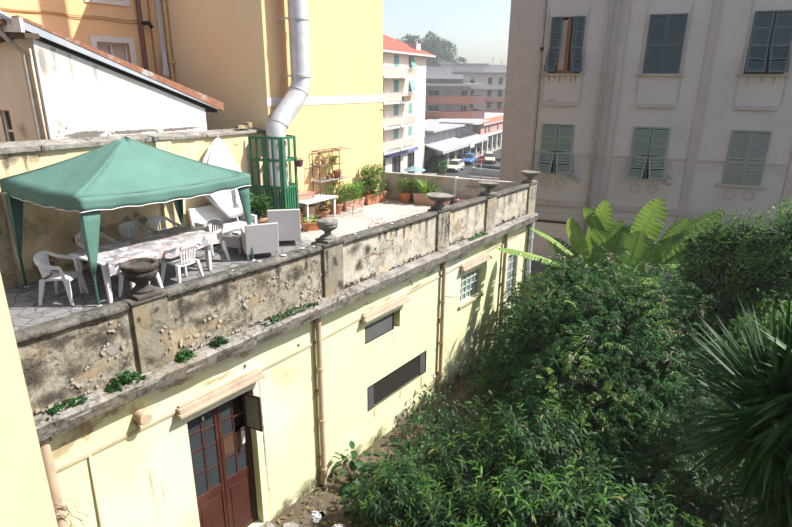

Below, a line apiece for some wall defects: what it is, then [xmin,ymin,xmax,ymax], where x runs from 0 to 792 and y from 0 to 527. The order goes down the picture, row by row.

water stain [84,323,129,346]
water stain [24,361,43,384]
water stain [40,391,66,406]